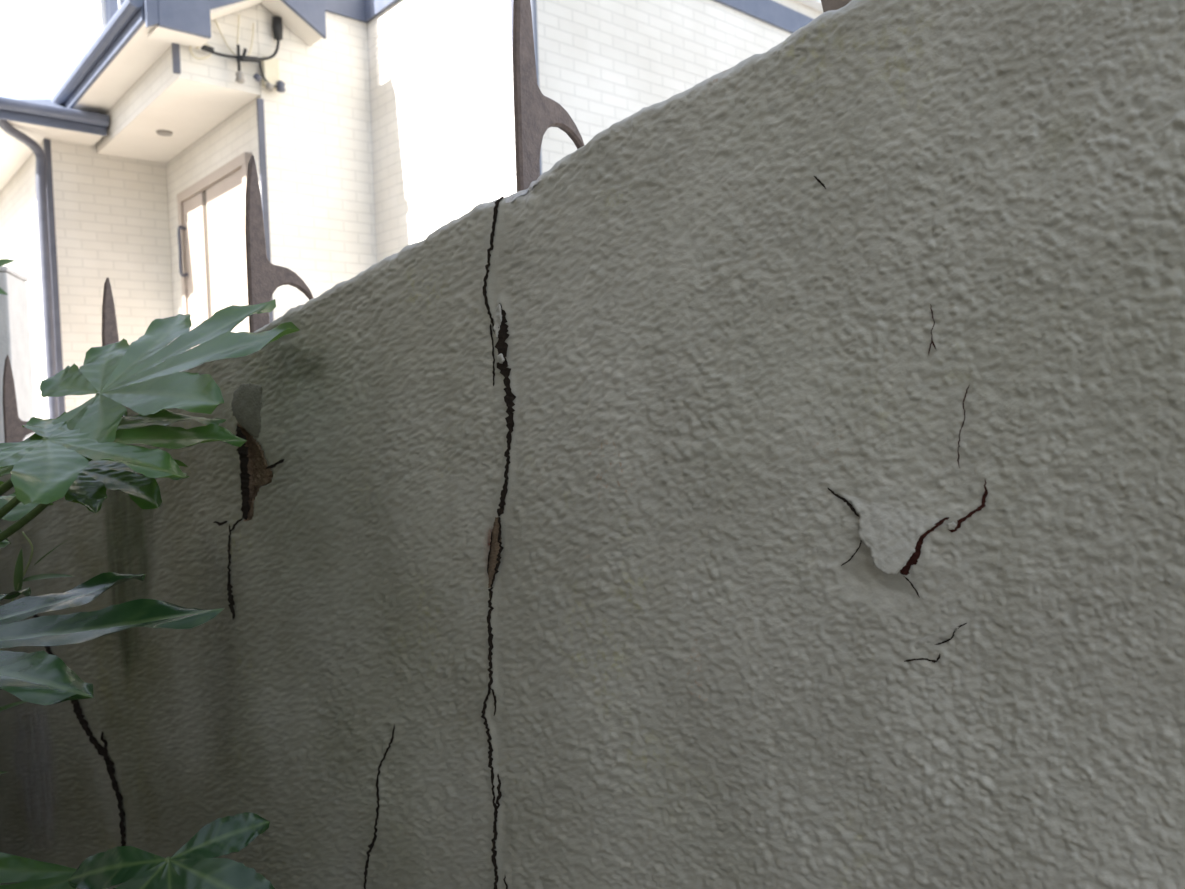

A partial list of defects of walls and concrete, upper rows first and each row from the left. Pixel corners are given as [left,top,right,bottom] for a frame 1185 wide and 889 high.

crack [227,518,243,620]
spalling [236,423,284,521]
crack [481,196,516,889]
flaking render [827,480,988,598]
crack [71,700,126,846]
crack [364,725,395,889]